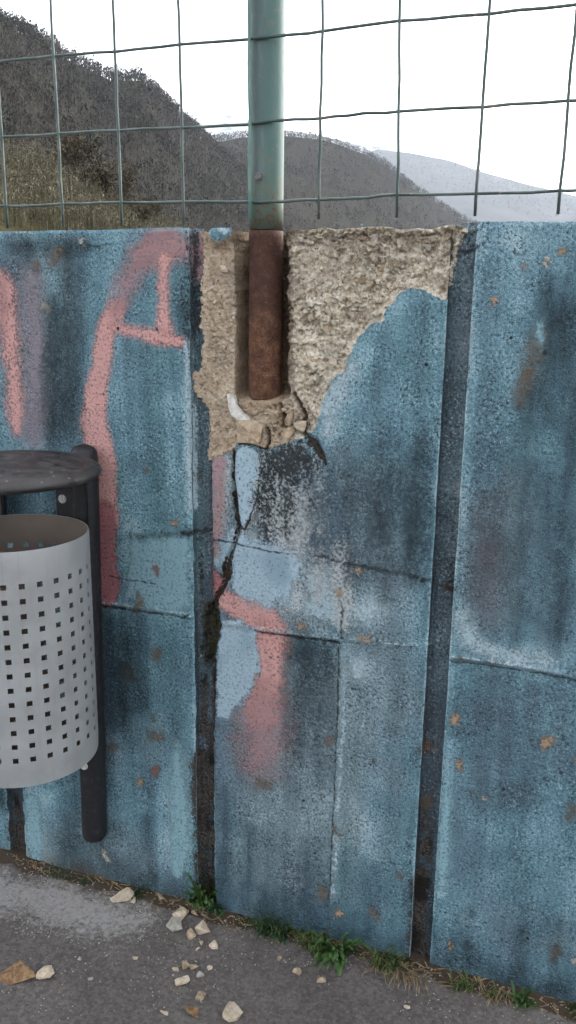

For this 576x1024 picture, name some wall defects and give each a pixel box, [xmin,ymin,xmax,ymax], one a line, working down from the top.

crack [180,450,288,612]
damp [248,439,356,633]
spalling [183,225,468,643]
crack [211,652,219,741]